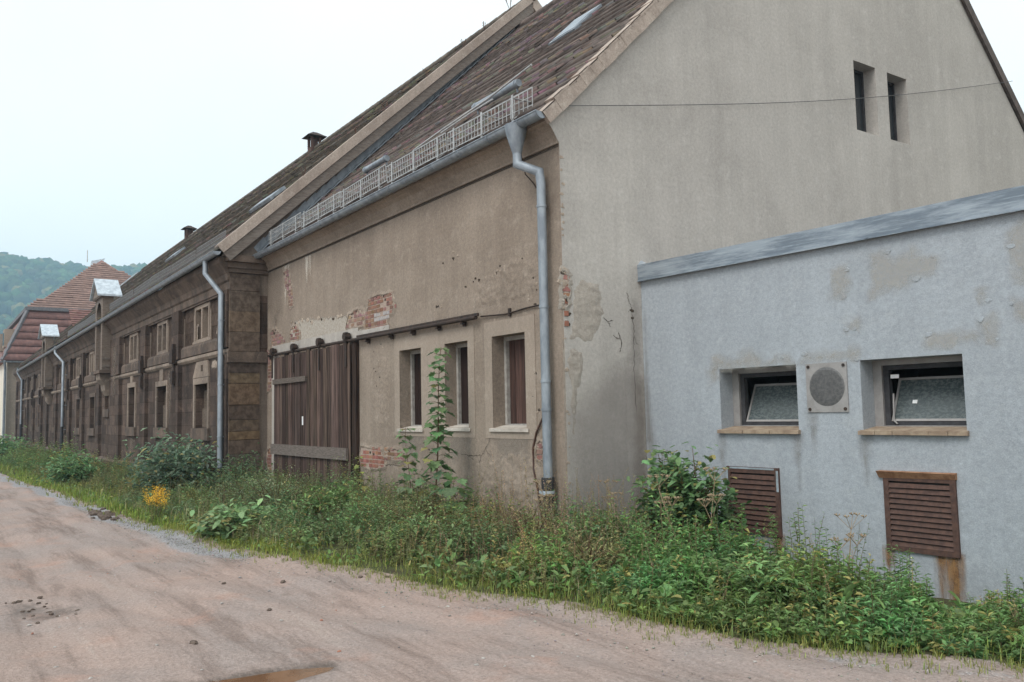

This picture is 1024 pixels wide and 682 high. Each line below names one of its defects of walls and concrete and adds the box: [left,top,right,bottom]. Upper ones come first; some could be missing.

flaking render [557,265,573,326]
flaking render [267,267,396,393]
flaking render [359,441,408,474]
corrosion [938,556,963,600]